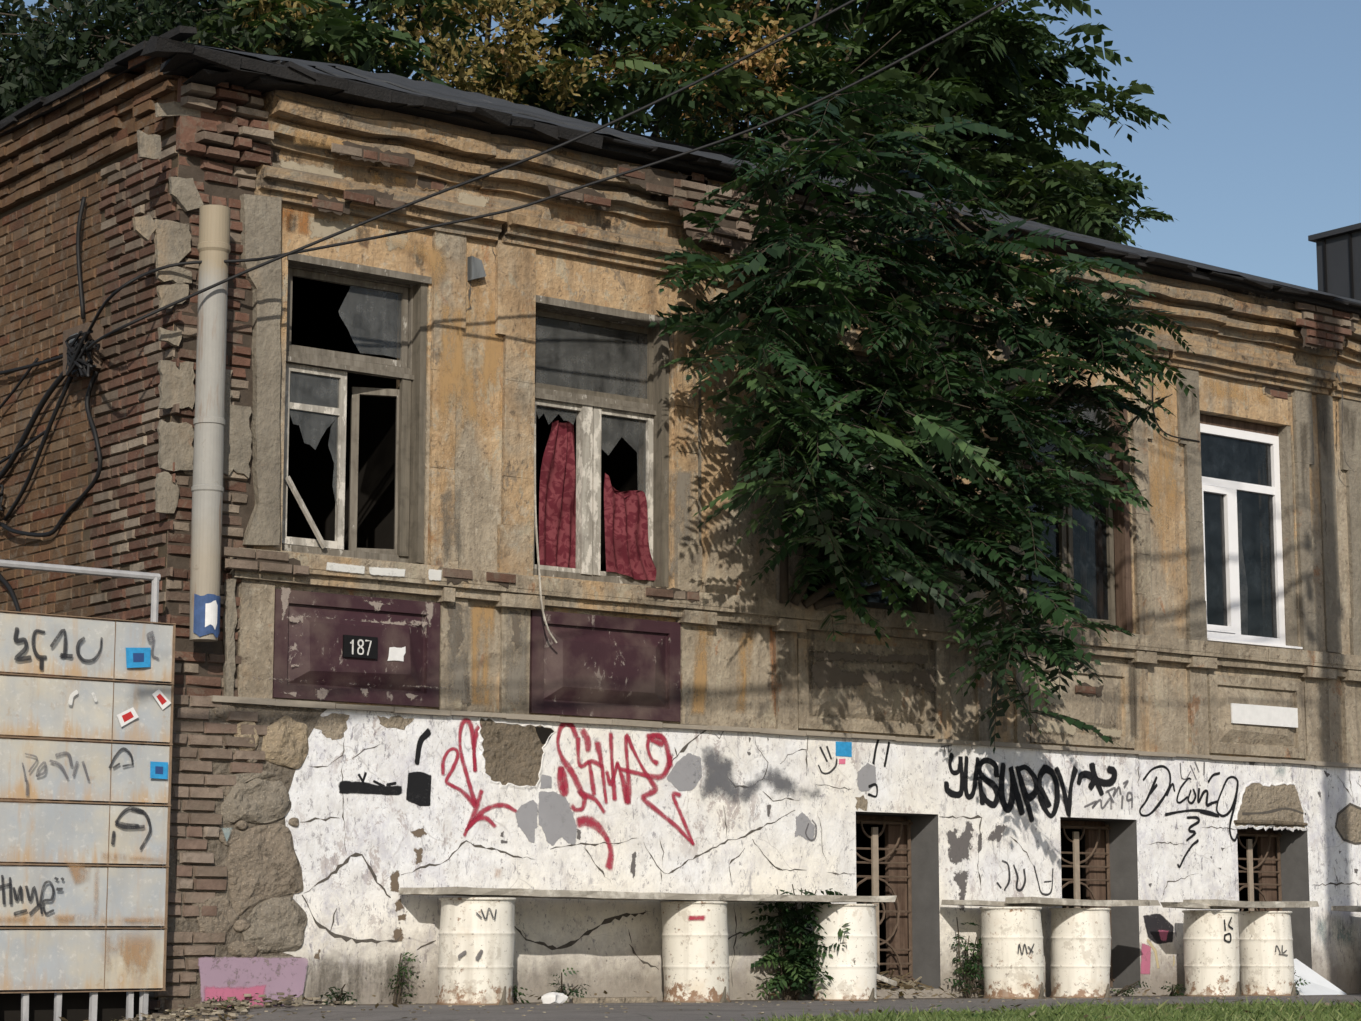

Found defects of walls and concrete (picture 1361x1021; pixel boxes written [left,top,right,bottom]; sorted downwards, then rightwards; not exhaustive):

flaking render [1295,302,1359,353]
peeling [326,562,405,577]
flaking render [428,568,516,588]
peeling [362,600,464,661]
flaking render [377,715,414,730]
flaking render [476,717,557,790]
crack [672,730,724,761]
flaking render [153,664,350,1014]
peeling [411,828,427,864]
crack [302,738,853,986]
flaking render [1335,803,1361,853]
peeling [390,870,407,942]